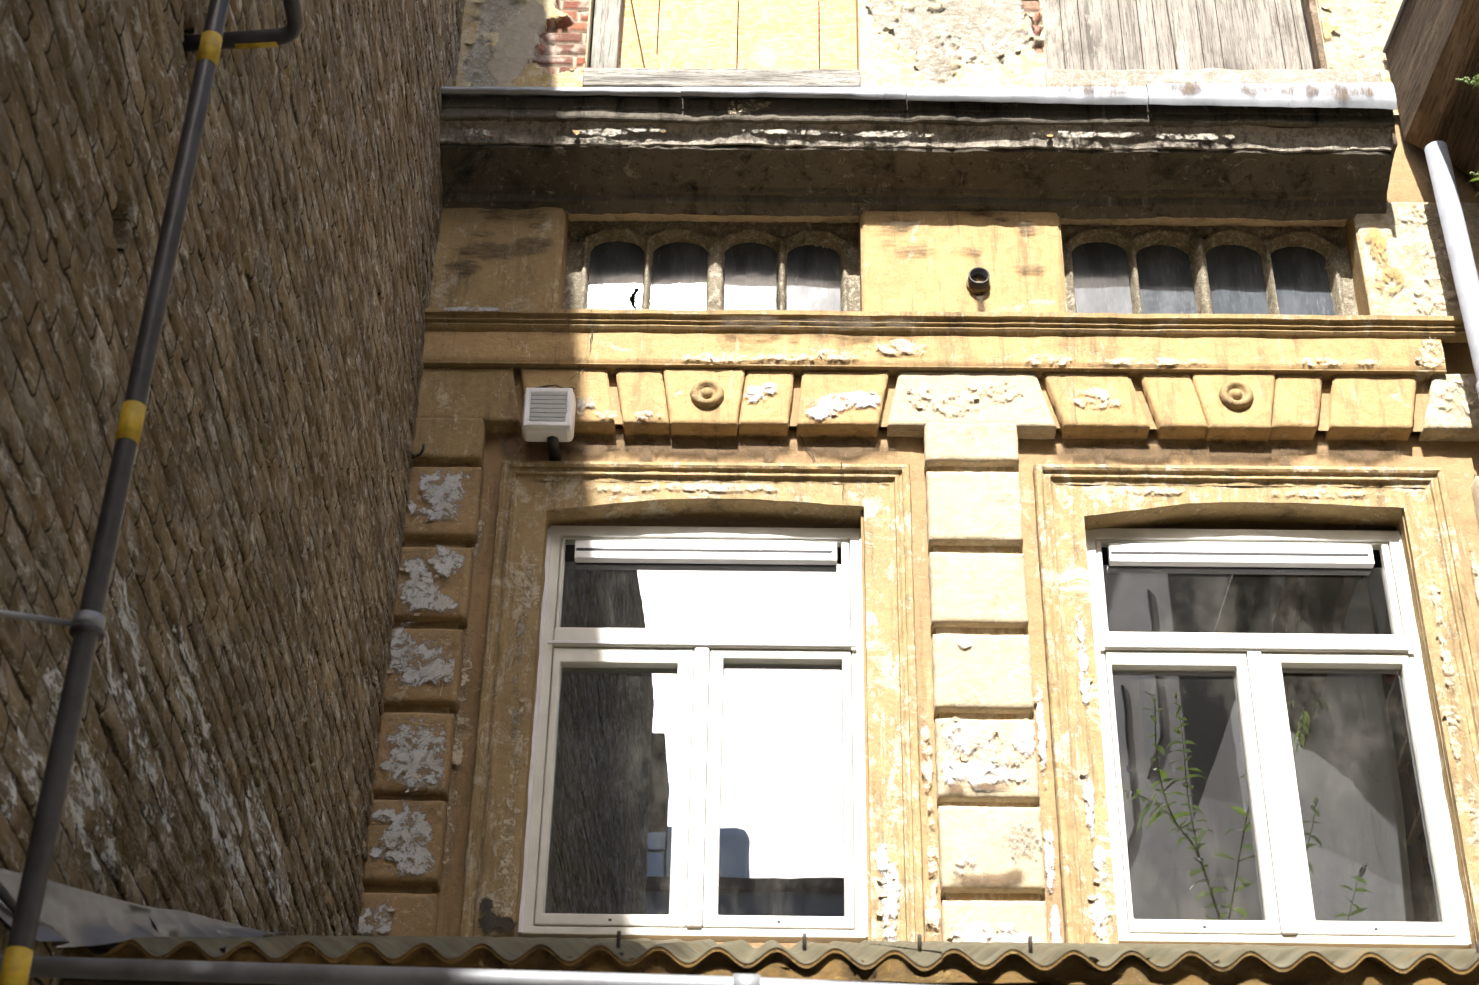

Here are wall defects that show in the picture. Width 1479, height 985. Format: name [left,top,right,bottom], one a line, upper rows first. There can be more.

peeling [461,0,526,87]
flaking render [528,0,590,74]
flaking render [865,0,1045,86]
peeling [803,390,880,420]
peeling [406,467,470,522]
peeling [369,513,485,876]
peeling [920,681,1063,943]
peeling [874,842,901,942]